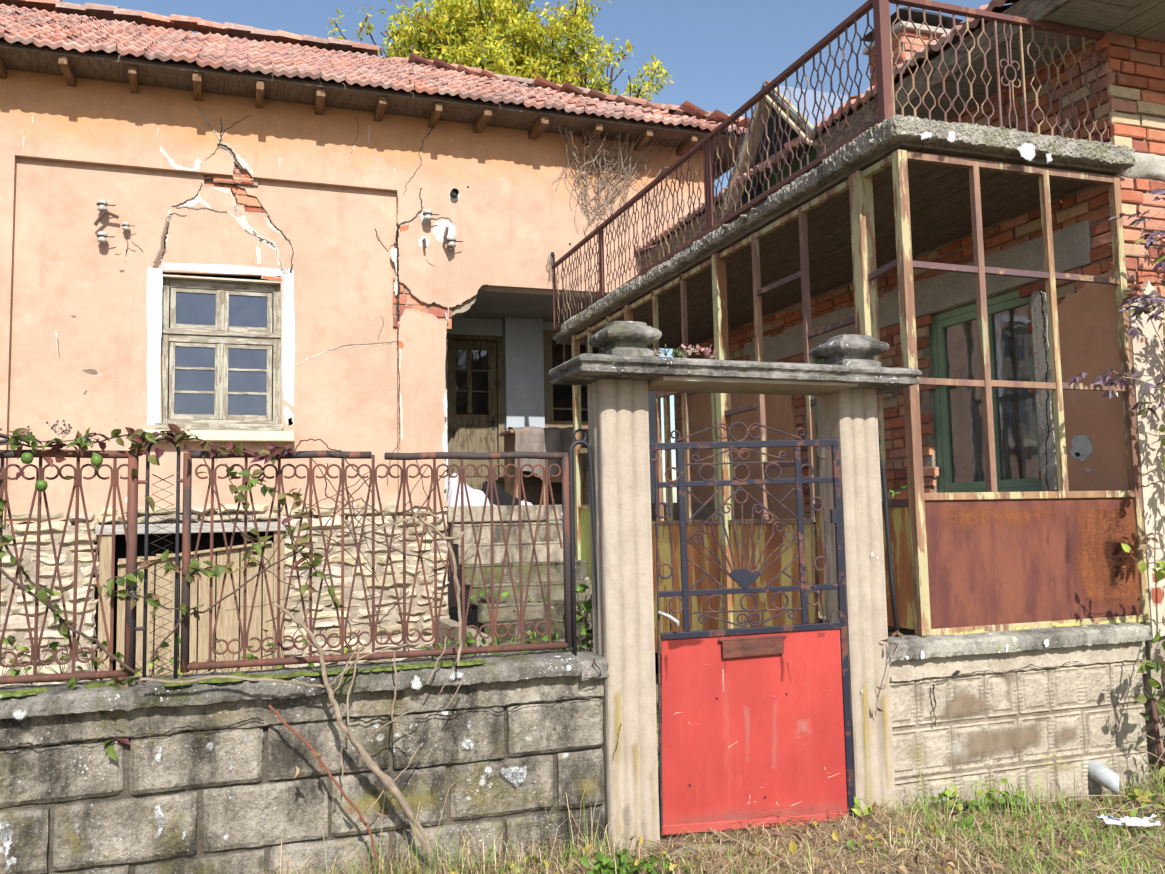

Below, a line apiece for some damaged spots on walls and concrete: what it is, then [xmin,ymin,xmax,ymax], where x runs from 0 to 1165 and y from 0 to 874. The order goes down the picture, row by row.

crack [117,104,295,273]
flaking render [160,143,285,282]
crack [295,128,452,443]
flaking render [390,248,452,376]
crack [1031,289,1058,491]
rust [1067,511,1137,601]
damp [943,693,989,718]
damp [949,724,1041,763]
damp [1056,728,1077,745]